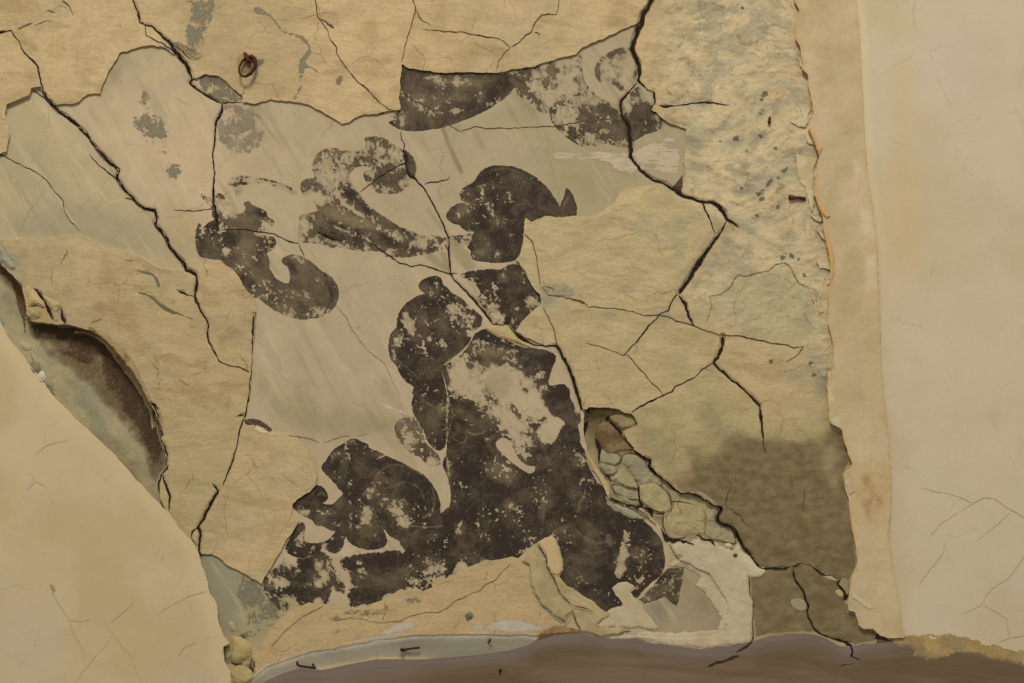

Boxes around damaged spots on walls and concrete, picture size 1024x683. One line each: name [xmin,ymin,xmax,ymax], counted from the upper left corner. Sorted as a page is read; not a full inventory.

crack [0,0,342,556]
flaking render [0,22,741,675]
crack [272,565,509,646]
crack [315,0,814,455]
crack [537,543,594,630]
crack [610,450,859,668]
water stain [680,430,876,643]
flaking render [790,106,835,285]
flaking render [828,371,843,430]
spalling [821,574,874,609]
flaking render [844,469,855,495]